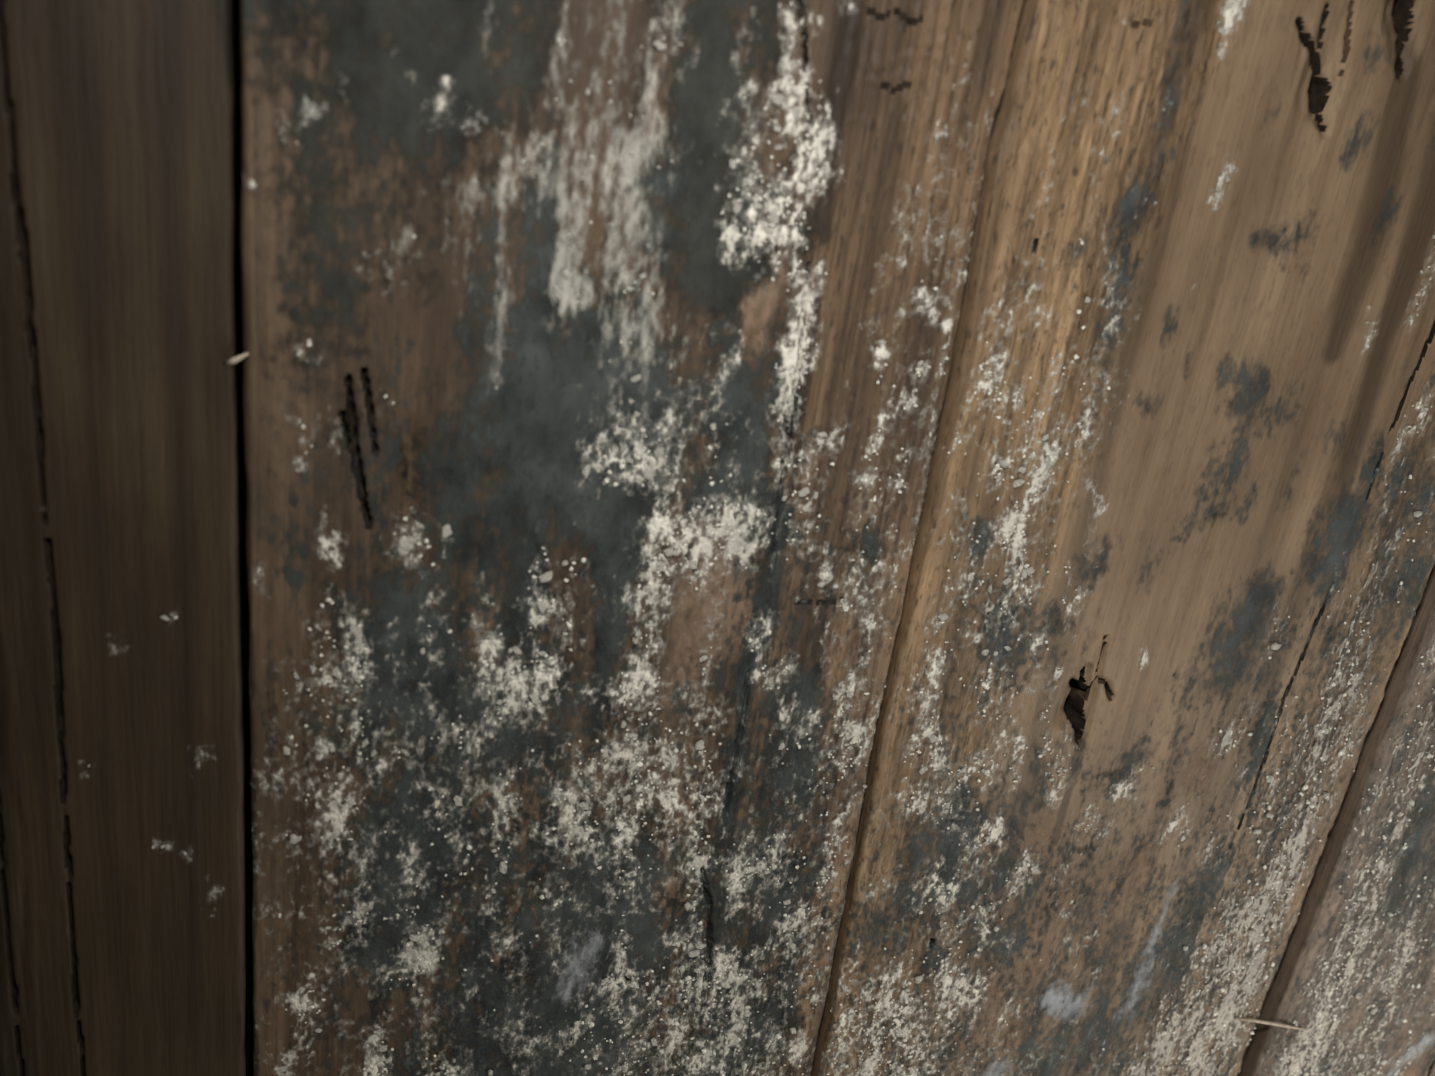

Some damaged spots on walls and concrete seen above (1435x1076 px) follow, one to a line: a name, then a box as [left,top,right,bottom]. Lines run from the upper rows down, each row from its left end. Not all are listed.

crack [796,0,817,179]
crack [866,7,924,26]
crack [880,81,912,95]
damp [241,0,566,392]
crack [777,262,811,500]
crack [1366,321,1435,500]
crack [0,0,86,1076]
damp [263,519,341,589]
damp [294,0,1435,1076]
damp [266,735,298,762]
crack [1229,587,1330,849]
damp [275,973,344,1076]